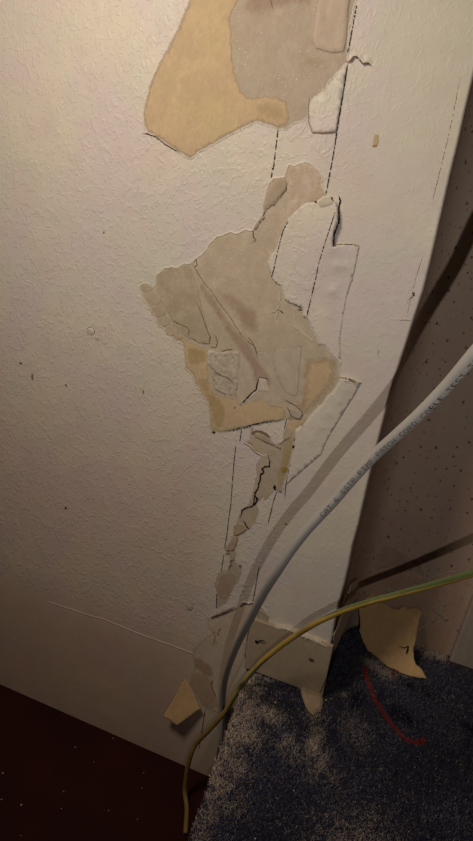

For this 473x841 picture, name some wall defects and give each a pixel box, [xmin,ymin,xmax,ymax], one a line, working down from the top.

crack [333,197,359,247]
crack [212,418,295,529]
peeling [190,601,269,713]